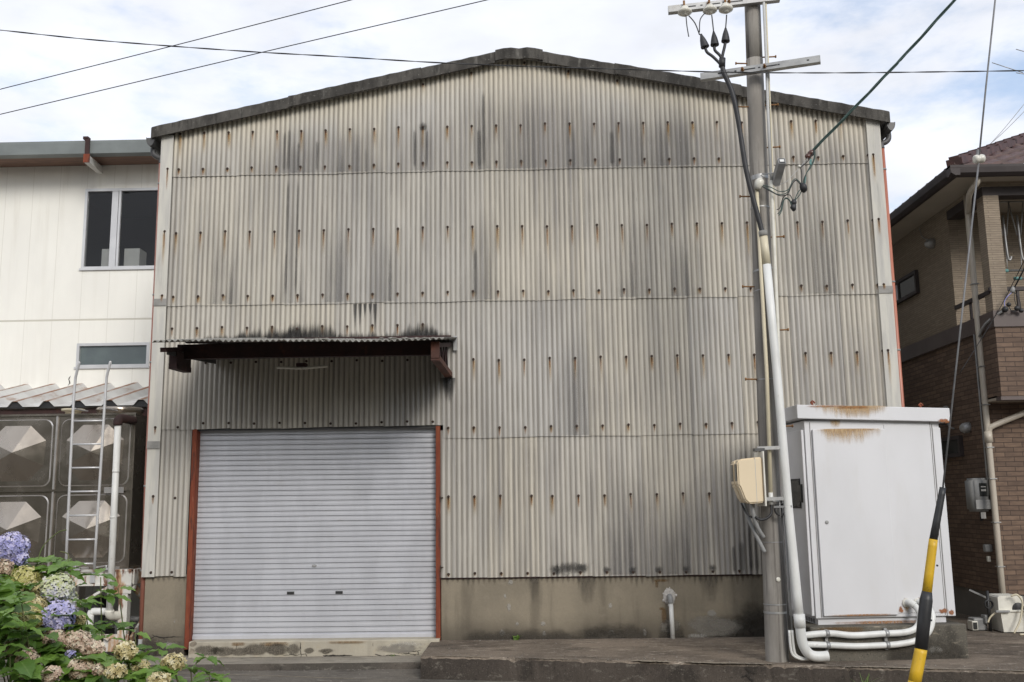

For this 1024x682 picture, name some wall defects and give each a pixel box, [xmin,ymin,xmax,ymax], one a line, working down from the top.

leakage [200,304,376,344]
leakage [393,327,450,343]
corrosion [815,405,880,437]
leakage [469,628,647,640]